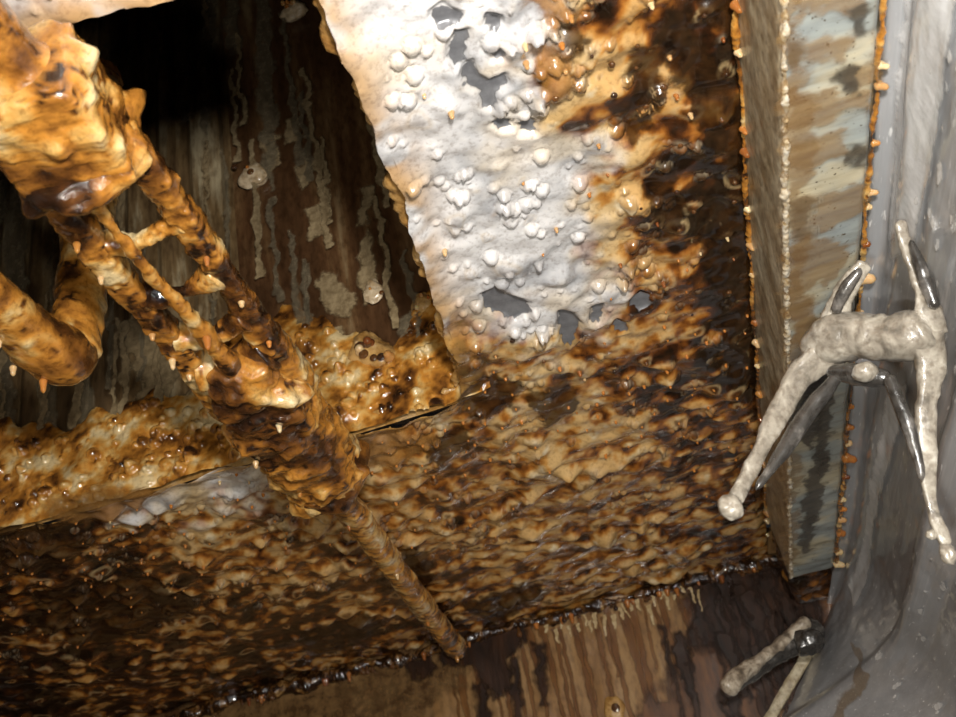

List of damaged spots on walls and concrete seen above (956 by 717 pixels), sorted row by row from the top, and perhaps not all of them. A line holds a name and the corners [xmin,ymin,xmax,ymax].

peeling [432,6,536,130]
corrosion [534,43,572,106]
leakage [559,21,591,61]
corrosion [860,0,888,262]
leakage [173,0,422,338]
corrosion [730,11,761,426]
peeling [482,287,532,318]
peeling [557,303,604,346]
peeling [629,291,652,311]
corrosion [45,485,160,524]
leakage [544,586,703,644]
corrosion [451,591,693,717]